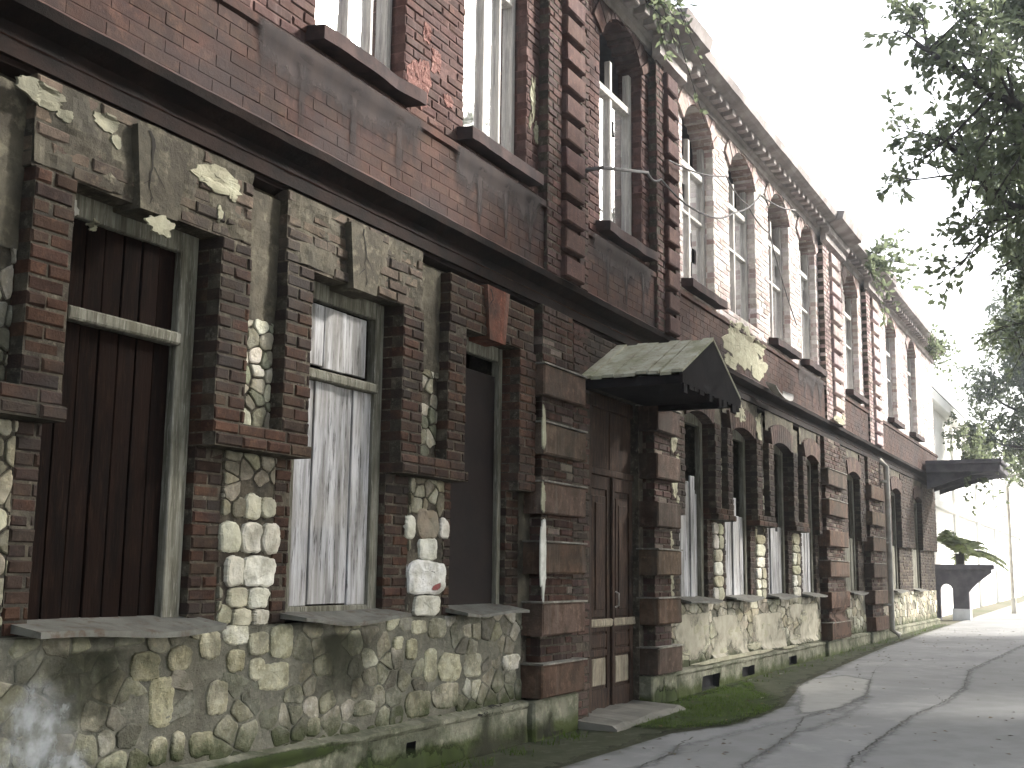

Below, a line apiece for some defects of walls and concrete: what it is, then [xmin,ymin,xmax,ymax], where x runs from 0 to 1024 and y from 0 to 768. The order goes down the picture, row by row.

peeling [14,75,74,123]
peeling [92,111,122,150]
crack [134,130,166,203]
peeling [73,200,100,231]
peeling [144,215,176,238]
peeling [189,164,242,222]
water stain [456,146,542,248]
peeling [721,320,768,382]
peeling [735,405,762,440]